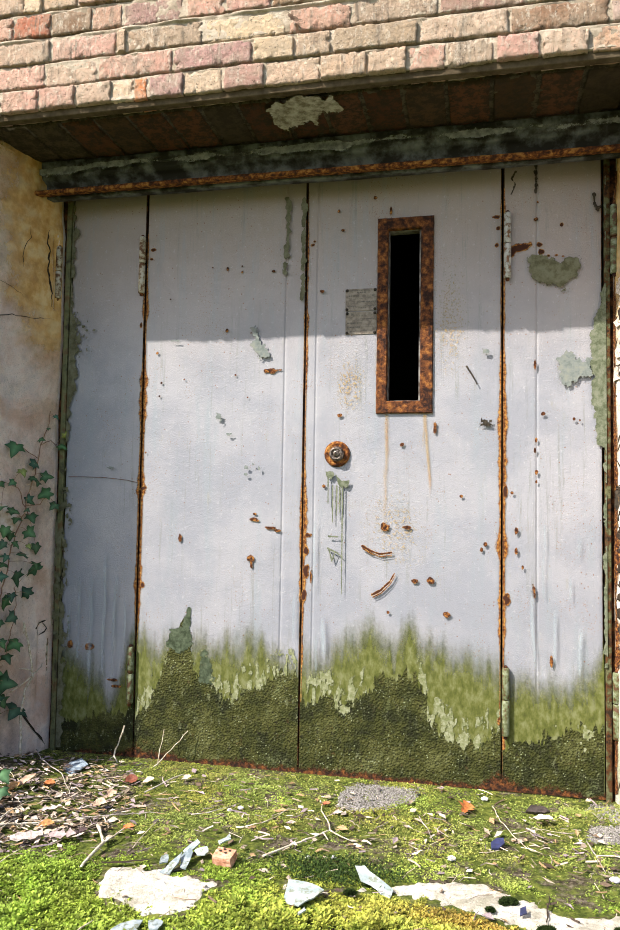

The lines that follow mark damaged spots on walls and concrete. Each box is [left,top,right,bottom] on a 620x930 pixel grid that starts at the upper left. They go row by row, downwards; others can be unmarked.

crack [1,230,53,319]
water stain [1,141,63,351]
rust [492,188,564,258]
peeling [527,254,581,292]
rust [133,234,159,649]
rust [299,222,316,702]
rust [357,490,432,566]
rust [480,278,519,667]
peeling [556,283,607,483]
crack [612,277,620,397]
crack [612,511,620,635]